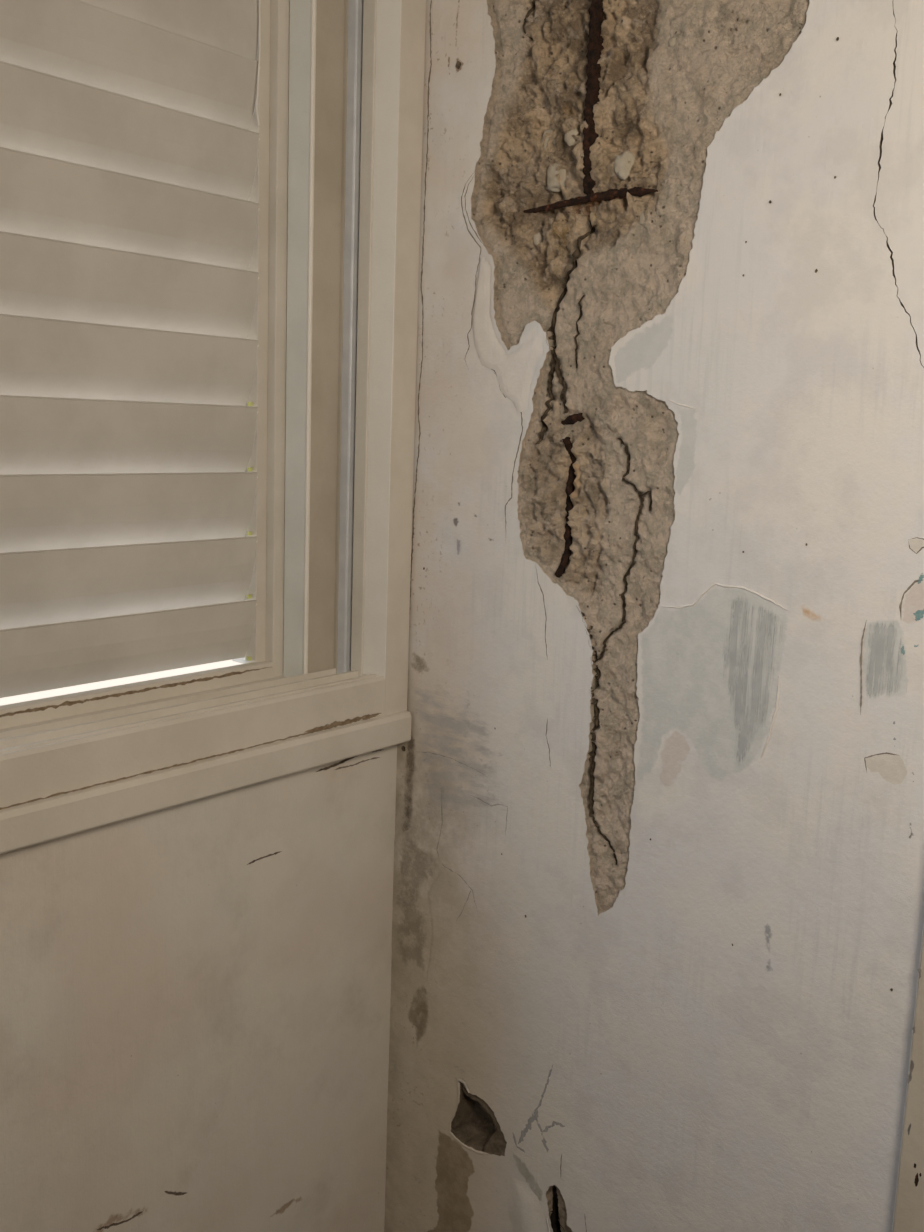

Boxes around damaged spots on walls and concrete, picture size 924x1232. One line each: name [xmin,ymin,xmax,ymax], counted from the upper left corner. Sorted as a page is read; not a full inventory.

crack [873,10,924,367]
spalling [470,0,810,916]
crack [536,569,548,659]
crack [579,438,652,865]
peeling [426,1079,507,1232]
flaking render [546,1185,572,1232]
crack [550,1155,587,1232]